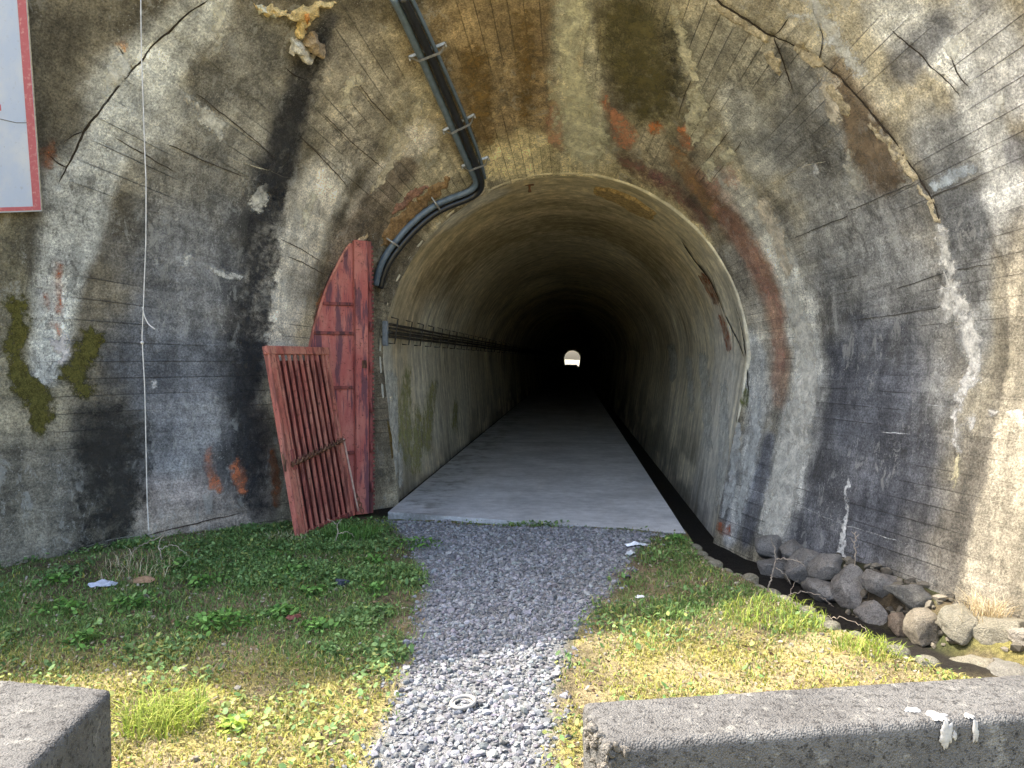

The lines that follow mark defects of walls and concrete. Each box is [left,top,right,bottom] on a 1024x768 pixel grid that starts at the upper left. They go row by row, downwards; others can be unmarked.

crack [48,0,208,185]
crack [116,138,243,177]
crack [197,94,273,156]
spalling [254,1,337,65]
damp [512,0,685,163]
rust [602,95,721,232]
crack [696,133,742,187]
crack [717,0,978,239]
damp [227,59,323,515]
rust [698,272,731,351]
crack [858,264,992,320]
damp [935,224,982,449]